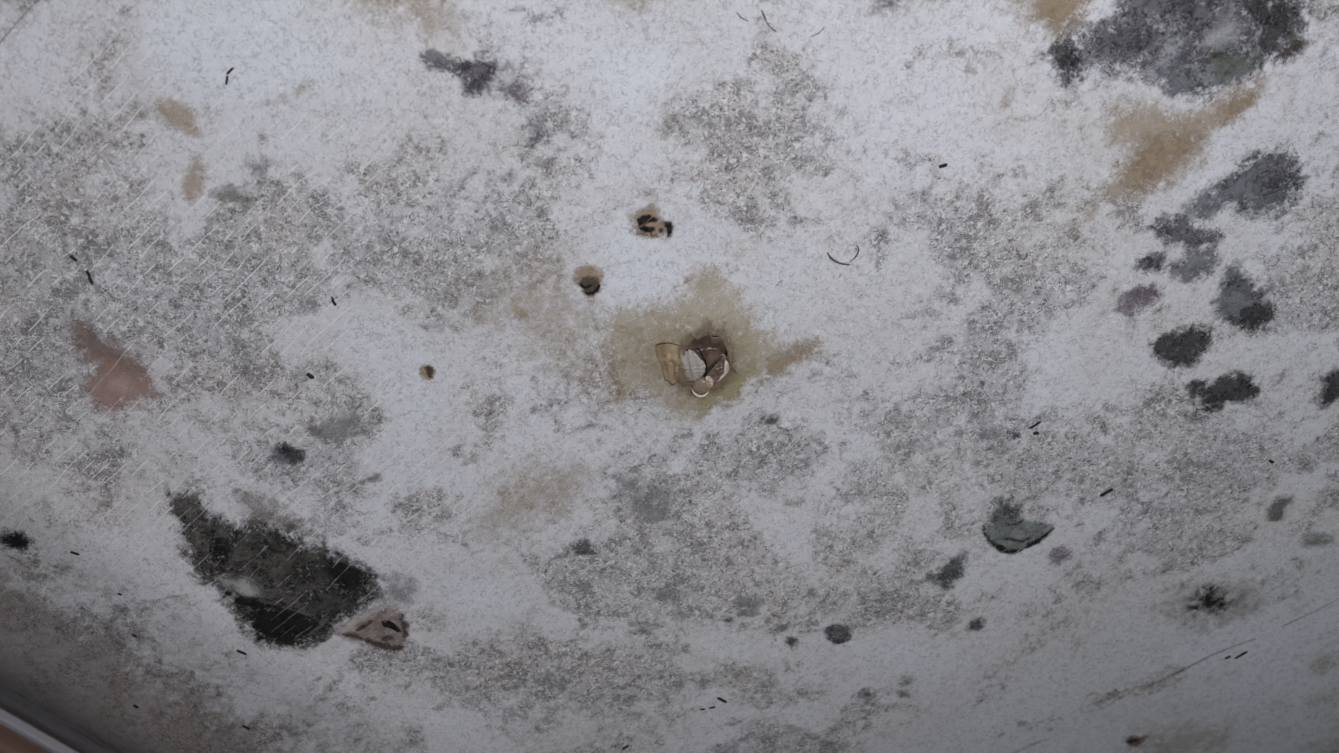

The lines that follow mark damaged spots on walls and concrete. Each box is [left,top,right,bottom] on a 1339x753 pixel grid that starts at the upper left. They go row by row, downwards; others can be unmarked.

leakage [1017,0,1315,200]
mould [1117,150,1308,421]
peeling [982,496,1054,554]
mould [1188,586,1233,613]